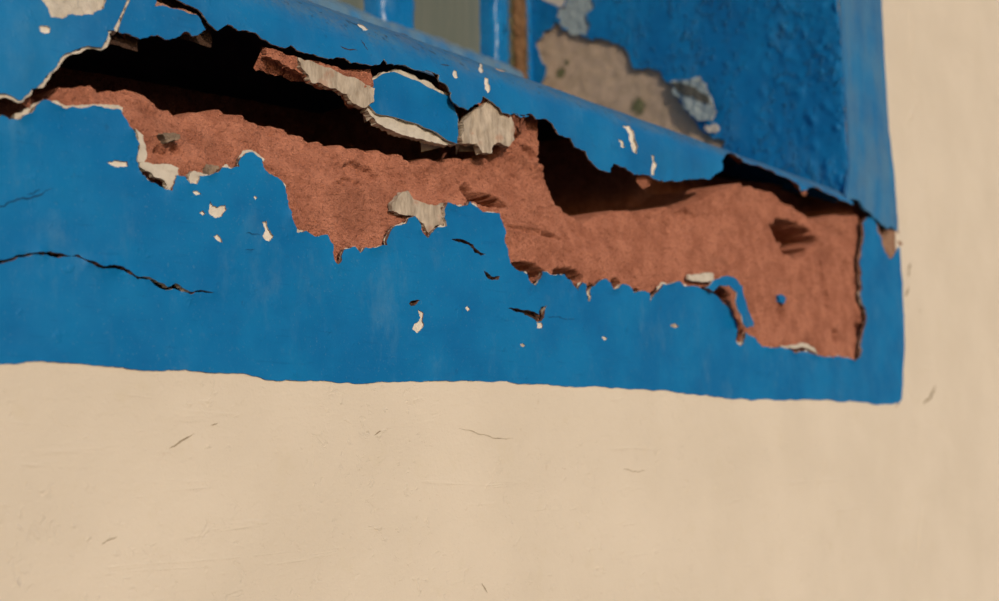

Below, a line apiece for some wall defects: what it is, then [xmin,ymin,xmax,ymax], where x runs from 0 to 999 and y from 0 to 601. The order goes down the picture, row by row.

peeling [39,0,105,33]
crack [109,0,138,52]
crack [155,0,212,48]
peeling [538,0,725,153]
spalling [0,31,883,359]
crack [0,252,209,294]